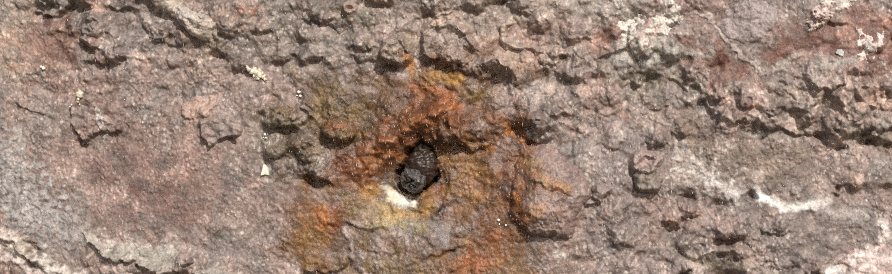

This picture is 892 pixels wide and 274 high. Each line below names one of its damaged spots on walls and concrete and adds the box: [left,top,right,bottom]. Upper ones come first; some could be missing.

corrosion [284,203,338,247]
corrosion [309,55,528,274]